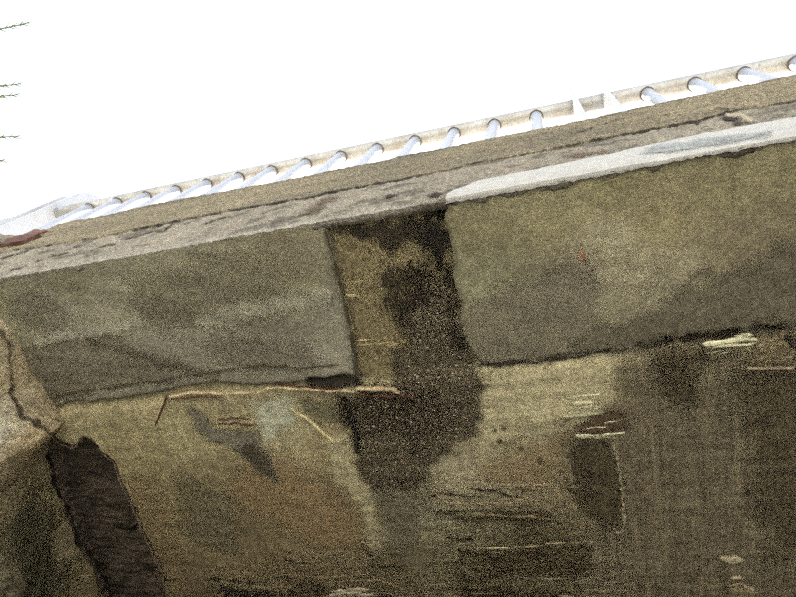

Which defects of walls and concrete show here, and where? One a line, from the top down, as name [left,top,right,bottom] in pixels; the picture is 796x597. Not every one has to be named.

crack [0,100,796,256]
crack [0,329,114,597]
spalling [40,437,176,597]
crack [49,230,360,399]
leakage [176,478,234,552]
leakage [223,588,278,597]
leakage [187,241,796,552]
leakage [563,341,796,597]